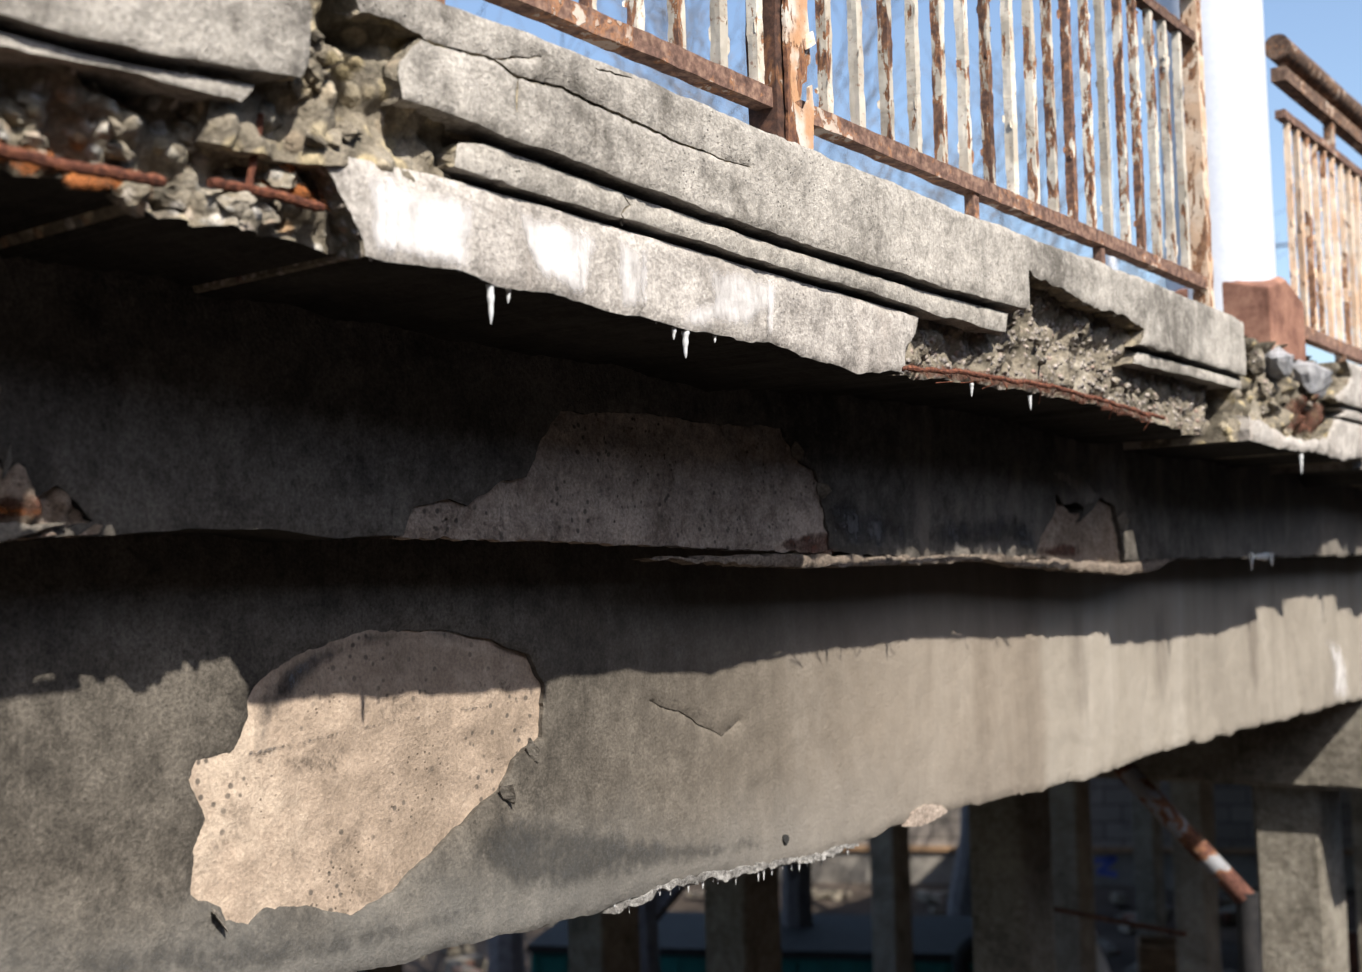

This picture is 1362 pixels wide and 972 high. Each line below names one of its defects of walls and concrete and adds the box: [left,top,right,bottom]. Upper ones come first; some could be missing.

corrosion [0,139,132,189]
spalling [0,0,488,286]
corrosion [254,163,329,207]
crack [415,37,704,152]
spalling [770,288,1362,466]
peeling [0,445,103,543]
peeling [380,411,1176,575]
peeling [189,630,541,932]